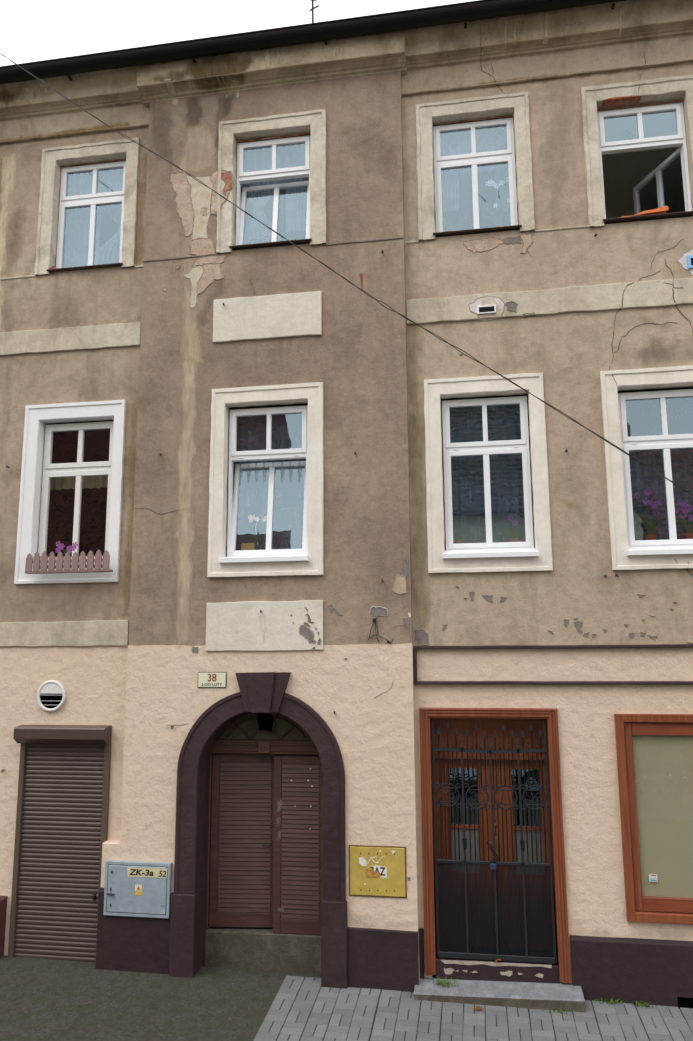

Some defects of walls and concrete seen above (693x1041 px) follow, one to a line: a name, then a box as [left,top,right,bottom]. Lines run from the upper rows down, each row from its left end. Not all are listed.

flaking render [170,169,234,308]
crack [609,239,693,384]
peeling [291,607,321,649]
peeling [548,618,607,637]